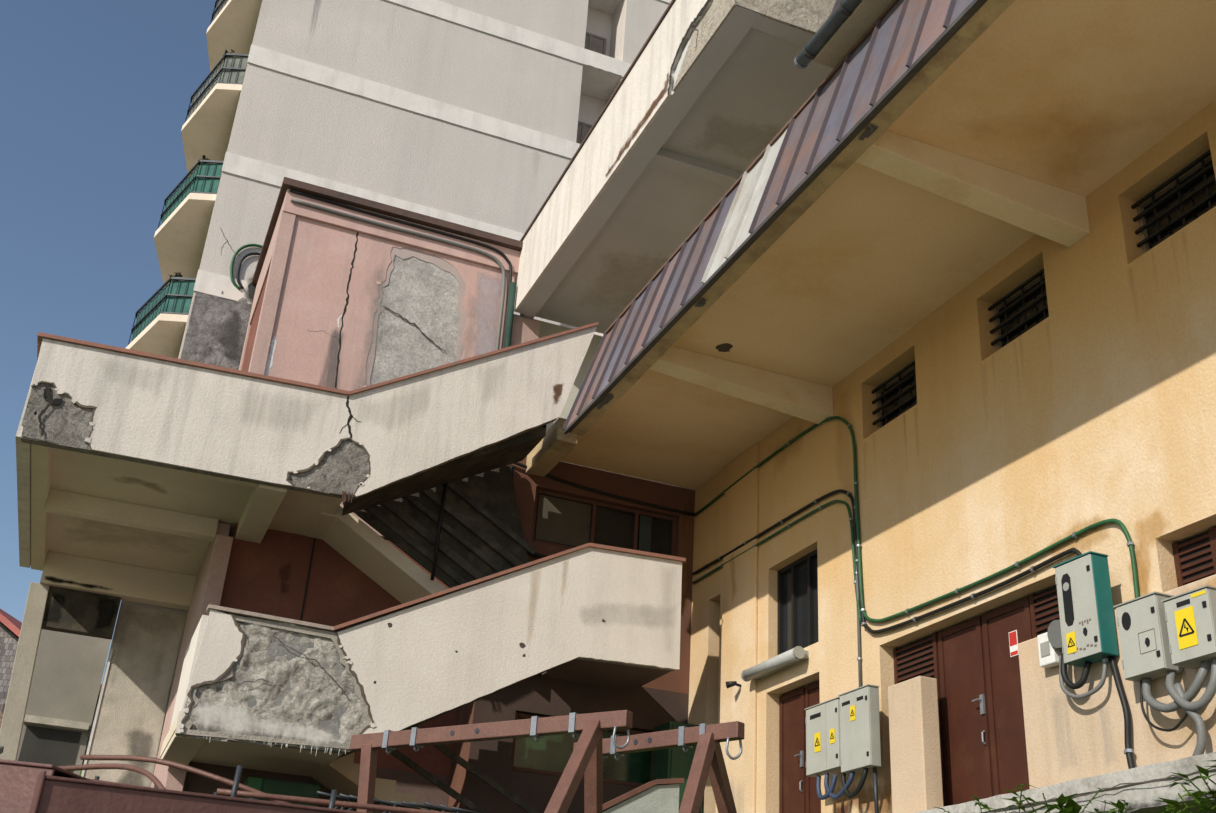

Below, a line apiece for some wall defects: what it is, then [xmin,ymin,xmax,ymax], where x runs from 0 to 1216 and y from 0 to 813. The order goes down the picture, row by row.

crack [667,0,711,95]
crack [308,232,361,438]
peeling [363,245,467,387]
spalling [21,382,95,450]
spalling [288,439,370,503]
spalling [178,614,376,755]
water stain [121,732,151,786]